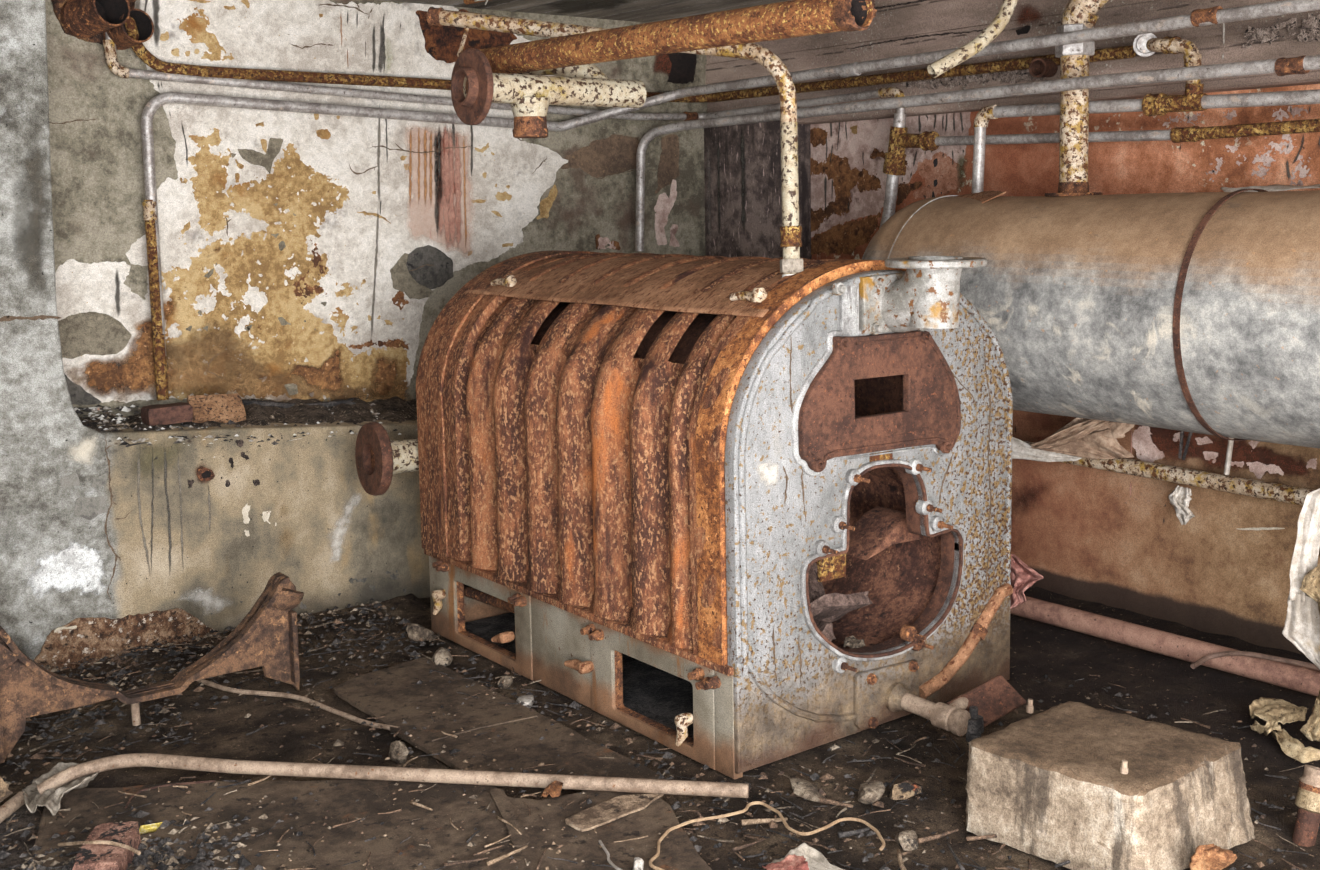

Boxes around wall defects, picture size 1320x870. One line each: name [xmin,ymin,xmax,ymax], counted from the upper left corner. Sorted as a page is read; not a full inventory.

peeling [55,0,639,405]
rust [408,124,473,253]
peeling [810,112,971,256]
peeling [1205,106,1311,186]
peeling [1132,426,1284,479]